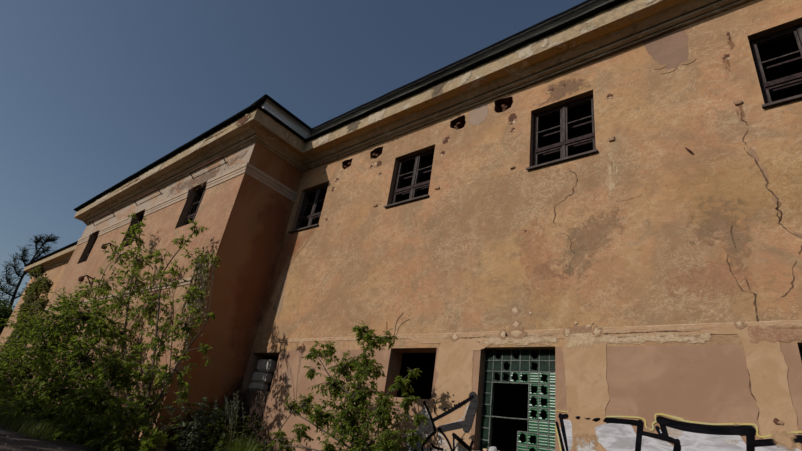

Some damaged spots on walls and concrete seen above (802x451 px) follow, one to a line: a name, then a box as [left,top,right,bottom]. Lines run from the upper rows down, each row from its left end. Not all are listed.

spalling [330,155,355,192]
spalling [366,142,386,176]
spalling [439,111,470,156]
spalling [490,91,518,132]
crack [553,169,578,257]
crack [741,112,802,297]
crack [726,223,759,322]
flaking render [409,322,802,451]